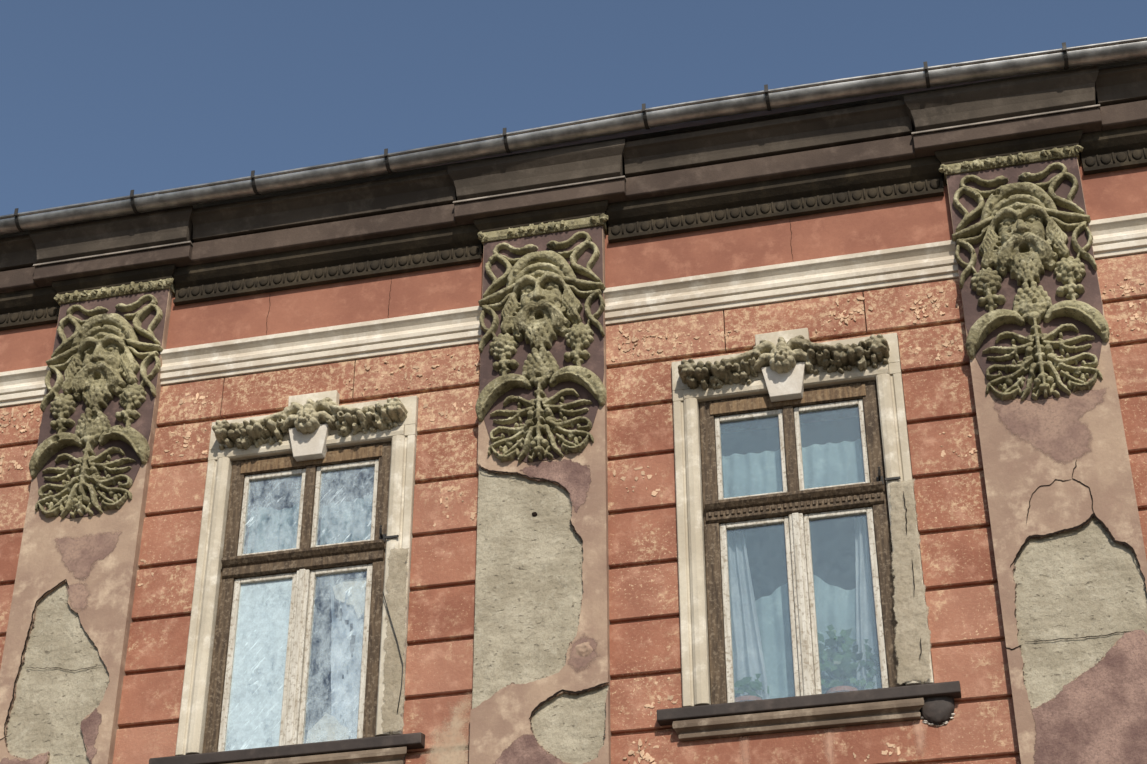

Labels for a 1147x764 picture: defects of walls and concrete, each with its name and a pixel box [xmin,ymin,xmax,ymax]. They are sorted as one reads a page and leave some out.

flaking render [0,532,121,764]
flaking render [433,459,597,709]
peeling [644,677,677,716]
crack [1010,460,1140,567]